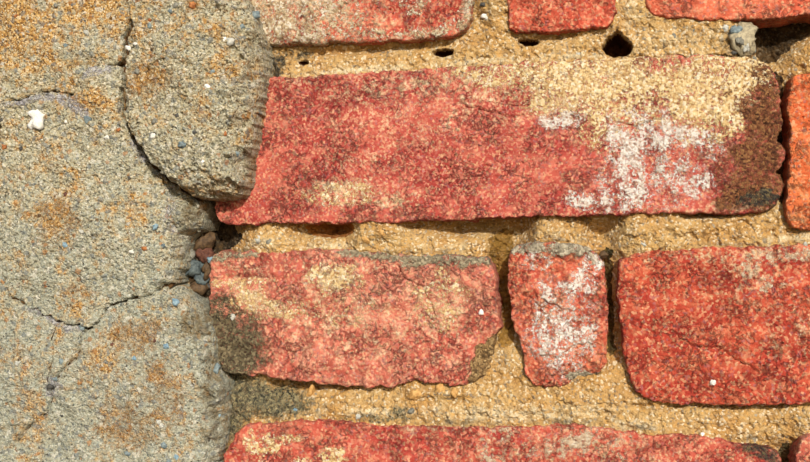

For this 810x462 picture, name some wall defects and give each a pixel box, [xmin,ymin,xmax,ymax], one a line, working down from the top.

crack [117,24,134,111]
crack [133,135,203,202]
leakage [301,180,375,207]
leakage [439,54,786,216]
crack [11,296,93,441]
leakage [510,241,605,380]